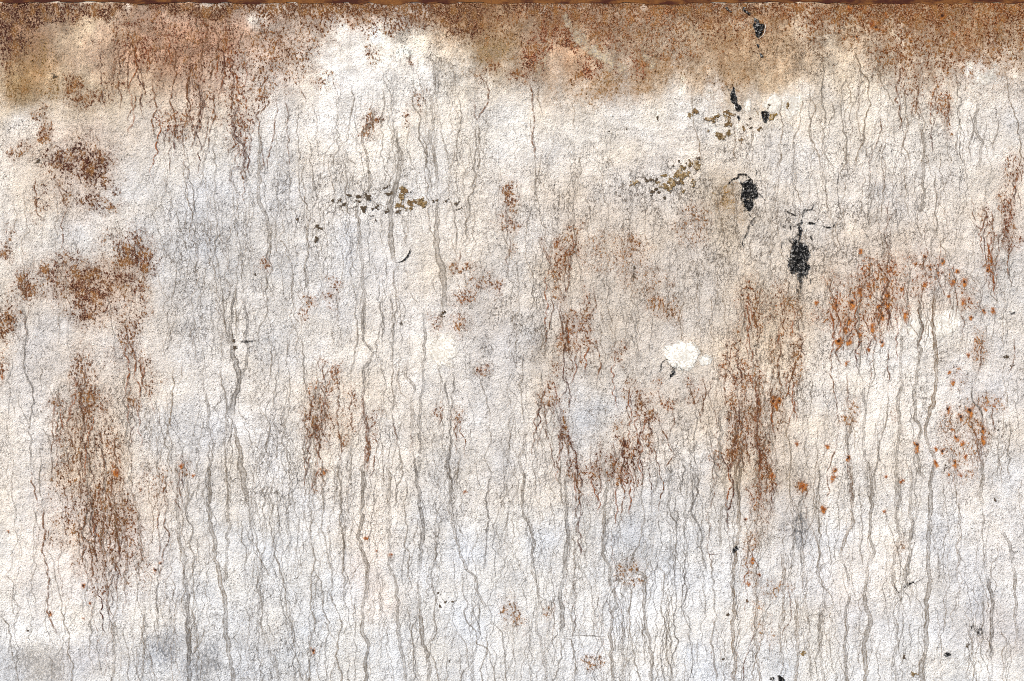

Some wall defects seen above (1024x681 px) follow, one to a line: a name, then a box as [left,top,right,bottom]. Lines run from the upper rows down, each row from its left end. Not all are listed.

corrosion [6,103,121,224]
corrosion [0,3,1024,195]
corrosion [0,228,195,631]
leakage [77,432,204,681]
leakage [205,290,286,680]
leakage [265,351,447,681]
corrosion [532,222,706,552]
corrosion [614,559,646,587]
leakage [594,440,686,680]
leakage [678,389,767,678]
corrosion [708,249,1005,678]
leakage [805,129,959,681]